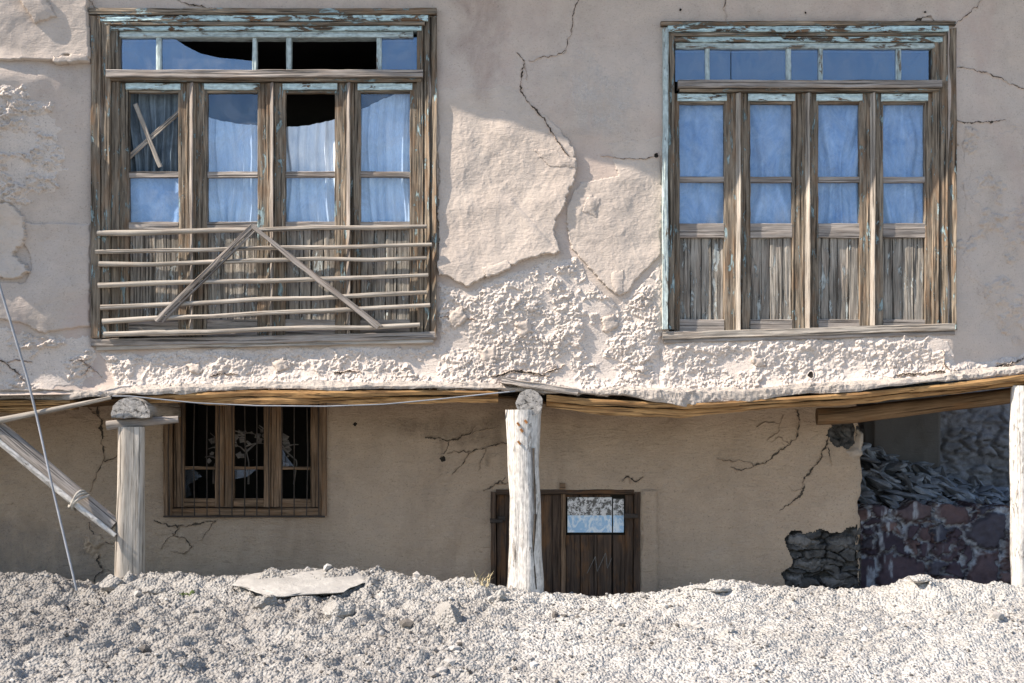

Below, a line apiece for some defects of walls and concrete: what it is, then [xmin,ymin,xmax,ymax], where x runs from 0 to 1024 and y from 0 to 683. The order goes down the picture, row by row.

crack [516,0,579,156]
crack [957,66,1024,90]
crack [957,118,1006,126]
spalling [0,84,1024,397]
crack [87,407,118,492]
crack [425,426,509,492]
crack [717,410,801,472]
crack [779,437,833,511]
spalling [826,423,863,458]
crack [82,522,113,583]
crack [154,519,217,555]
spalling [781,520,861,590]